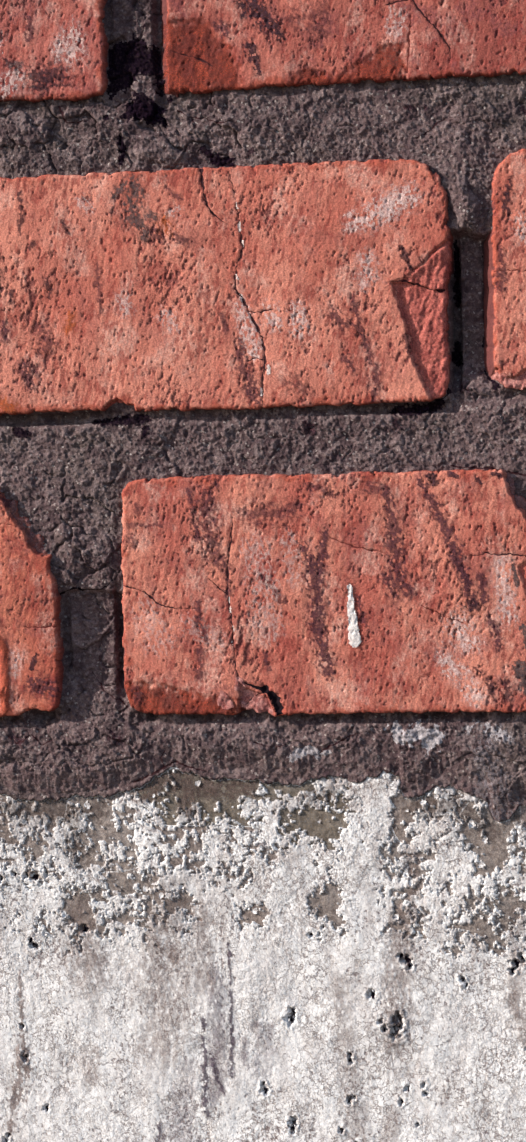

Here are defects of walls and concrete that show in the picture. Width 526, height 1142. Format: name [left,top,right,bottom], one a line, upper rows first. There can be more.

crack [170,50,213,67]
crack [386,0,451,73]
crack [177,110,231,138]
crack [199,168,272,404]
crack [60,569,196,609]
crack [208,517,284,716]
crack [319,731,367,753]
leakage [136,769,256,817]
leakage [384,852,420,1041]
leakage [7,970,30,1134]
leakage [200,943,246,1118]